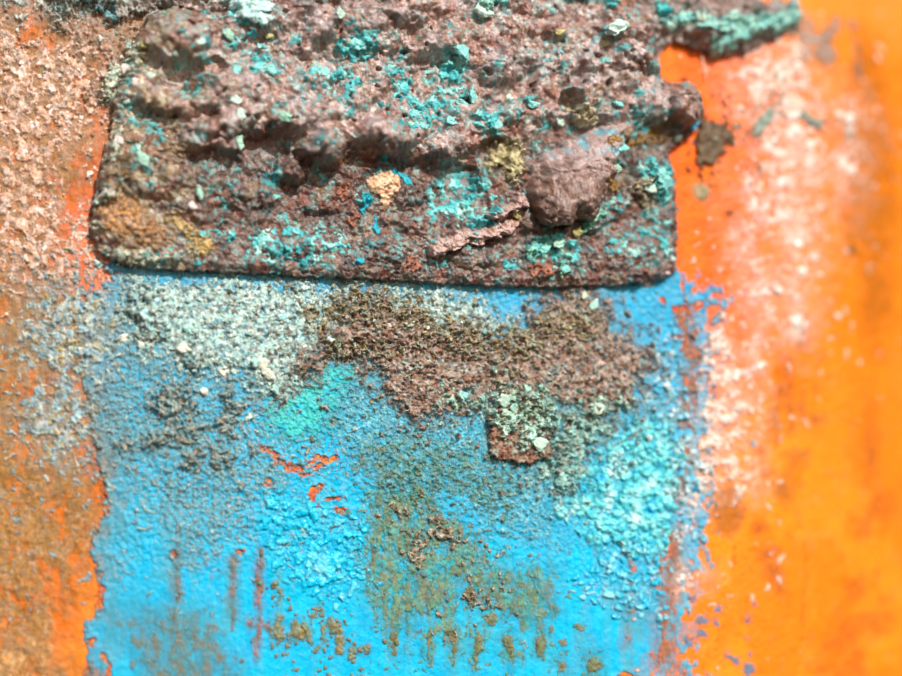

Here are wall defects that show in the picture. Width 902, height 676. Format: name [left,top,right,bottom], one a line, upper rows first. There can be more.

peeling [657,297,702,315]
corrosion [263,190,713,513]
peeling [71,446,111,514]
peeling [259,445,348,515]
peeling [78,550,134,618]
corrosion [628,559,637,614]
corrosion [655,525,682,667]
peeling [647,646,688,676]